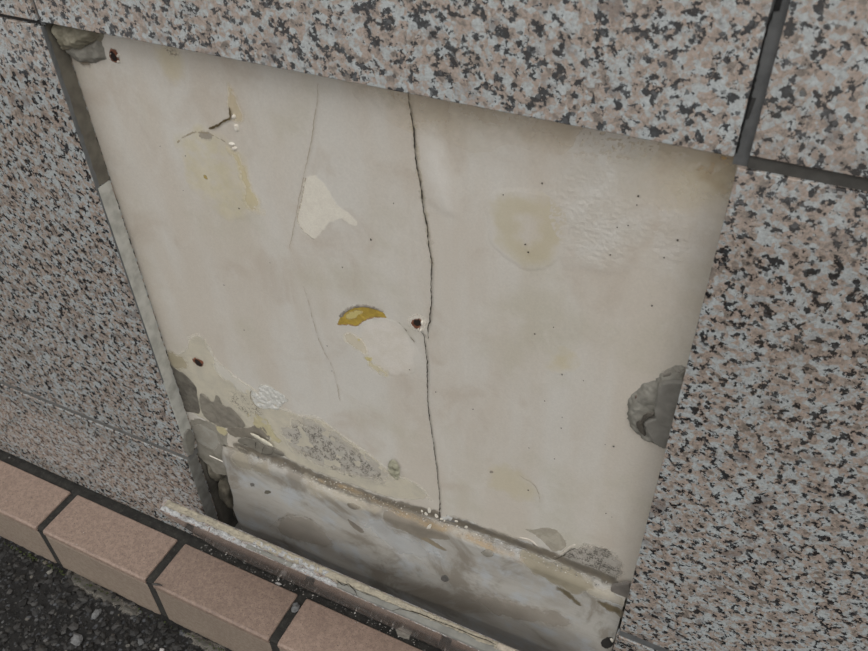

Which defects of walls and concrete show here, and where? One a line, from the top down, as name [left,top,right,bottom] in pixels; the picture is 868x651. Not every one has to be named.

crack [289,85,318,246]
peeling [296,174,358,239]
spalling [338,305,386,326]
crack [404,95,441,516]
peeling [168,334,468,551]